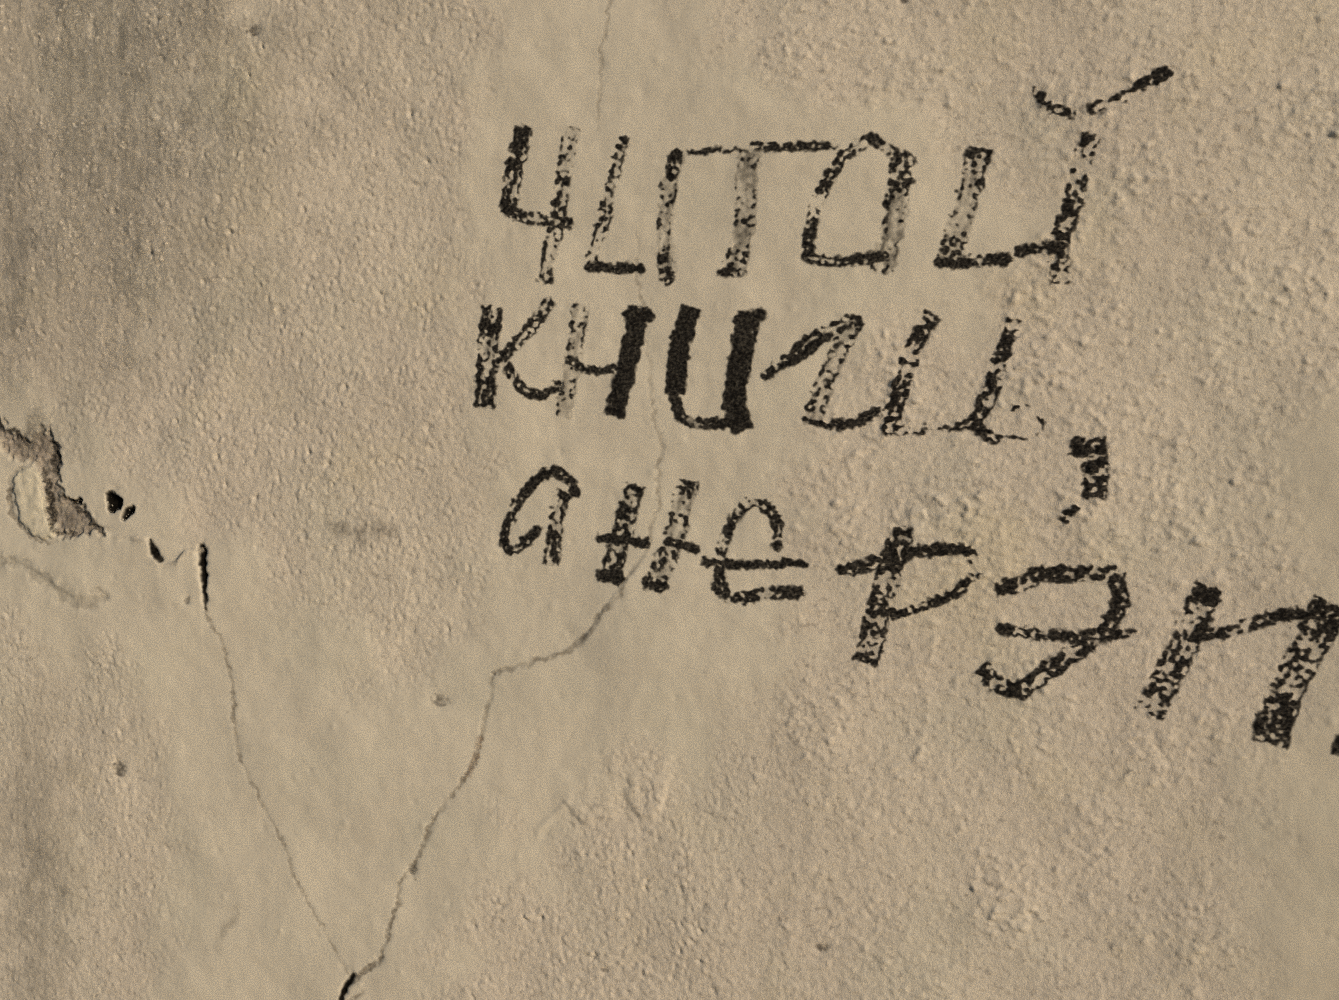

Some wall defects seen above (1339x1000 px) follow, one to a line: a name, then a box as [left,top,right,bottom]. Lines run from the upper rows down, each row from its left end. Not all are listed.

spalling [0,420,101,539]
crack [199,544,208,609]
crack [339,912,395,1000]